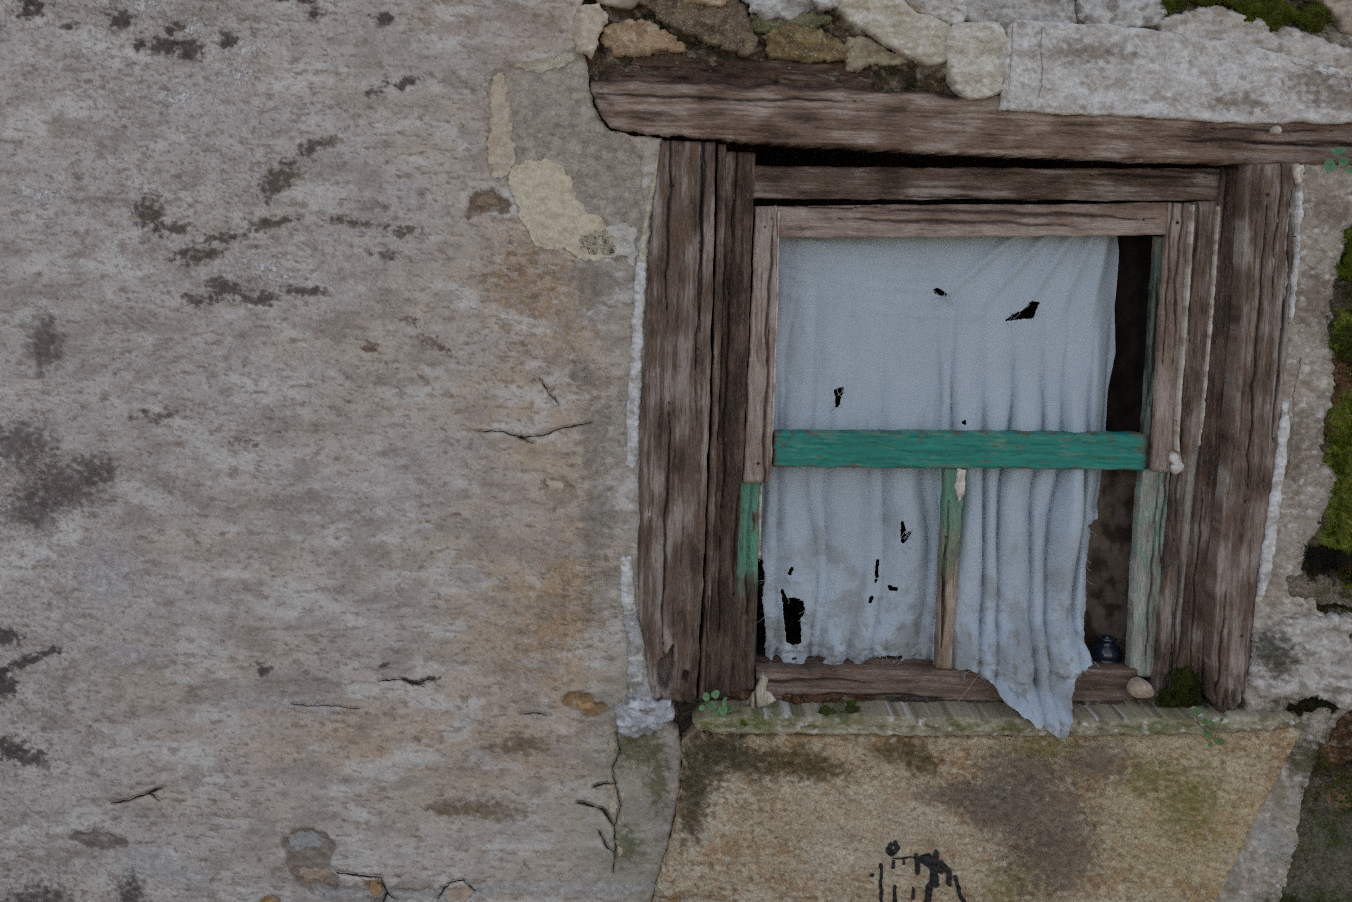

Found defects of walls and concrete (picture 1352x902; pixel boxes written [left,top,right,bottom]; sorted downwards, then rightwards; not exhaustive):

spalling [465,50,644,270]
crack [477,378,591,443]
crack [578,732,625,873]